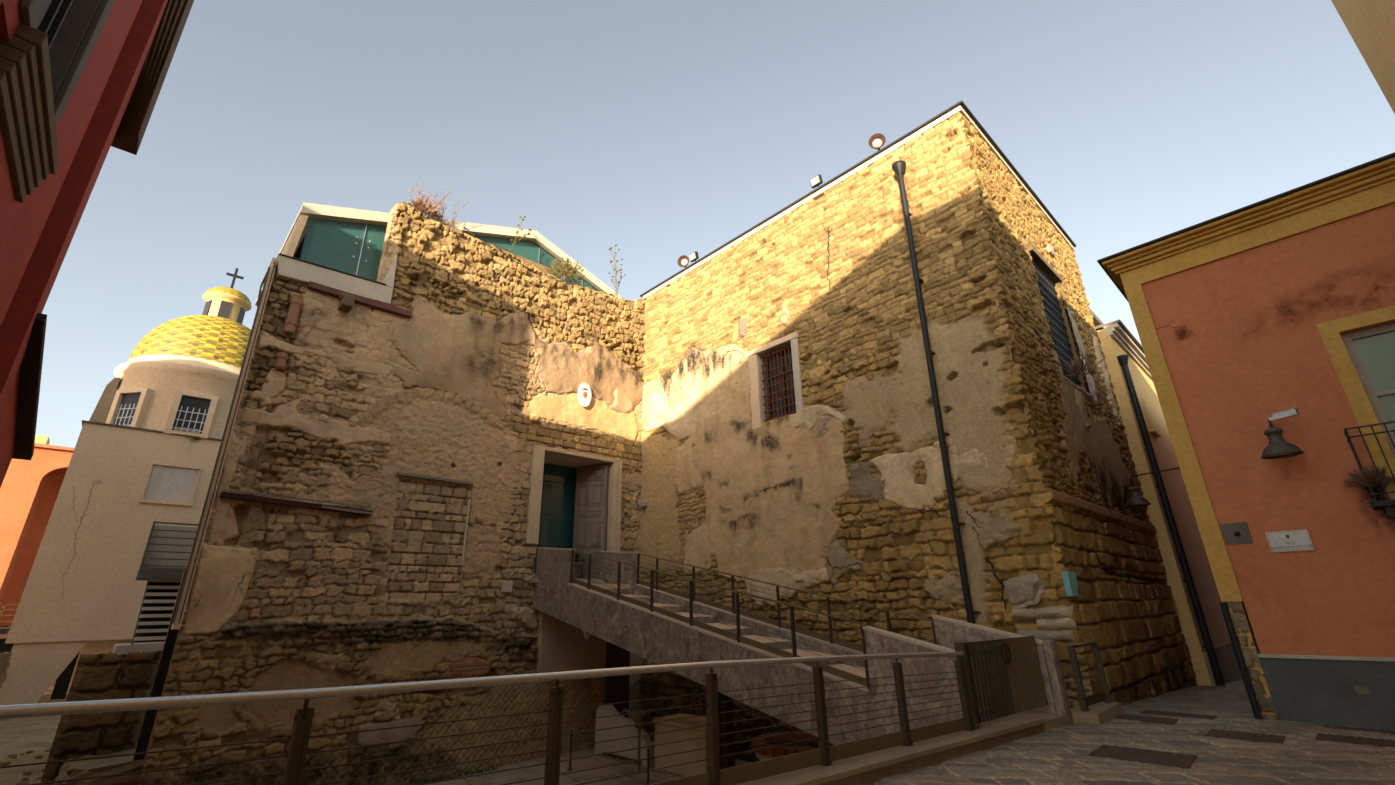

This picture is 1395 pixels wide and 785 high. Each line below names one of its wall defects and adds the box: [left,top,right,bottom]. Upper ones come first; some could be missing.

peeling [177,368,391,636]
peeling [257,295,850,608]
peeling [871,436,987,516]